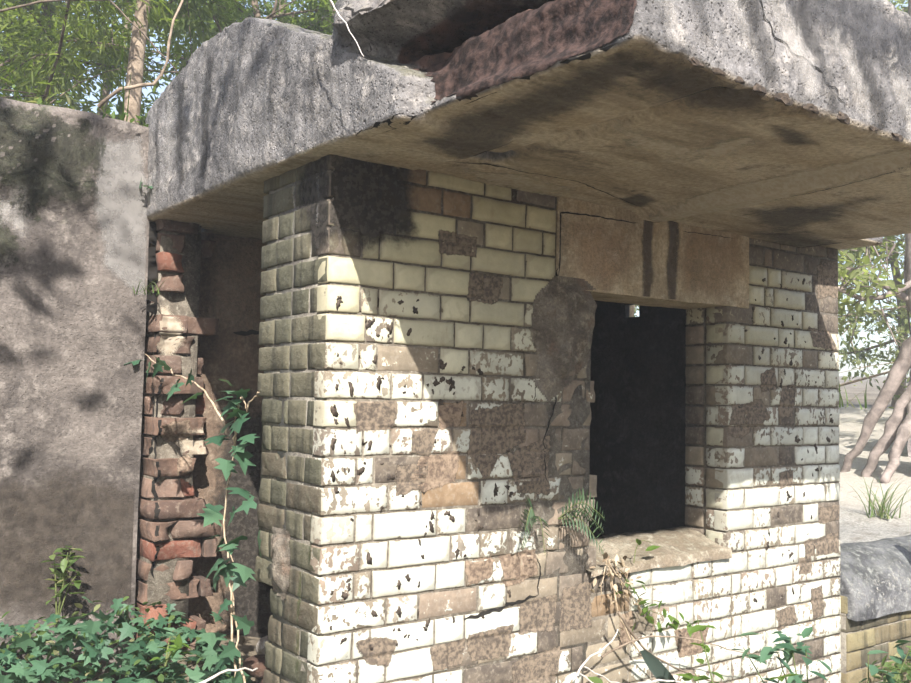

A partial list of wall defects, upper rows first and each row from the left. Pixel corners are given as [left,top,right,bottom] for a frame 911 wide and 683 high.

spalling [414,0,637,104]
leakage [298,155,417,250]
crack [234,329,259,337]
peeling [330,382,415,450]
peeling [387,359,550,505]
crack [531,387,557,479]
peeling [330,467,365,494]
peeling [788,505,840,575]
peeling [340,606,431,667]
crack [464,559,541,620]
peeling [430,549,592,683]
peeling [776,585,824,631]